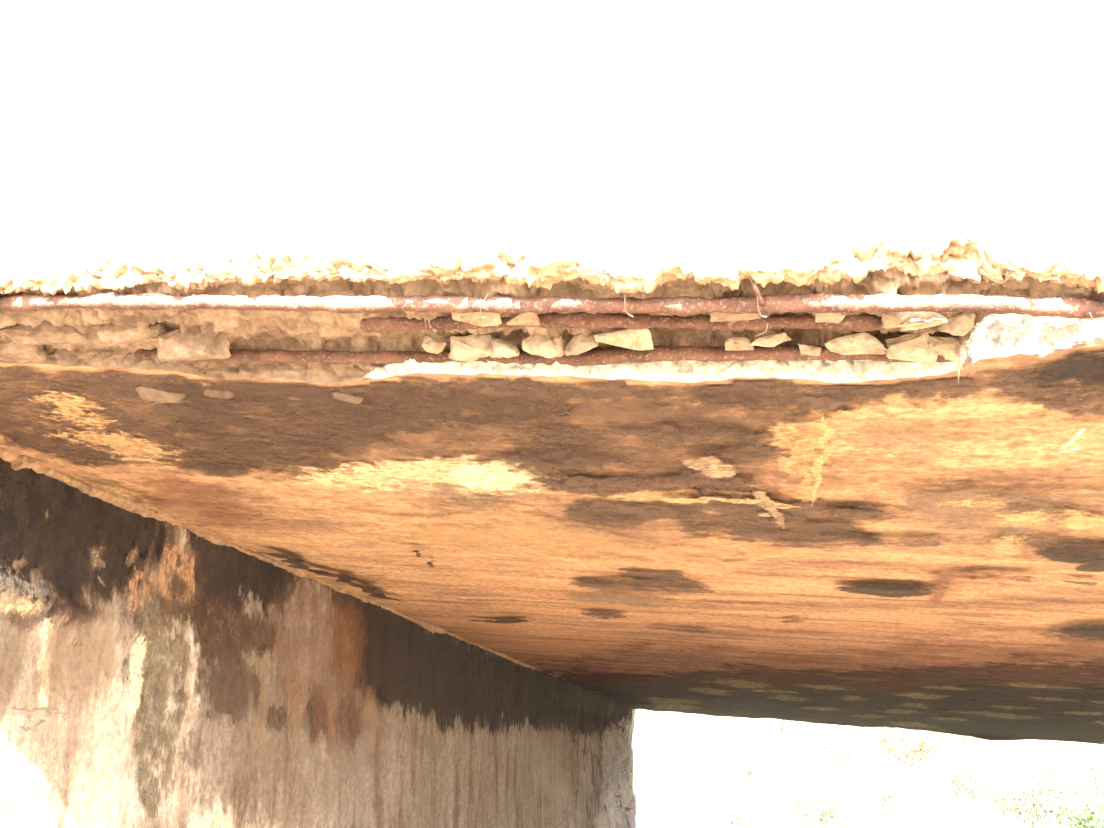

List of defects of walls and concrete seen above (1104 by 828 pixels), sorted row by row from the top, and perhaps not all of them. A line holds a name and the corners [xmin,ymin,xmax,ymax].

spalling [0,227,1104,405]
leakage [0,314,1104,586]
leakage [0,458,166,722]
leakage [152,529,311,733]
leakage [565,571,714,619]
leakage [303,585,1104,748]